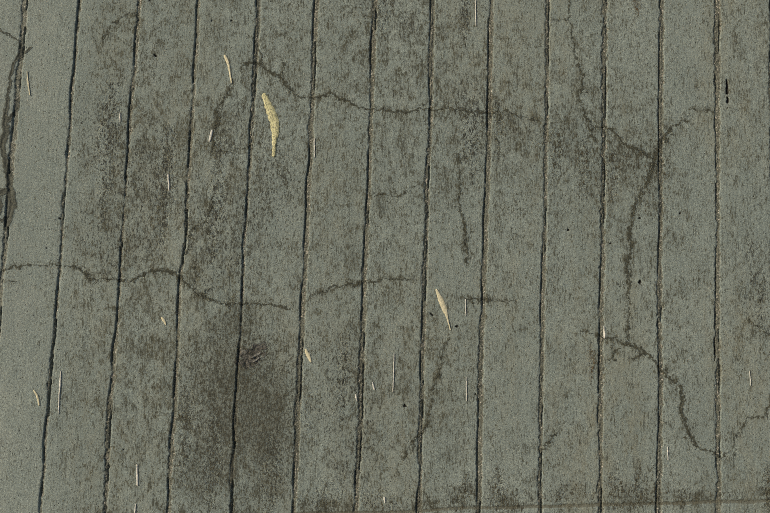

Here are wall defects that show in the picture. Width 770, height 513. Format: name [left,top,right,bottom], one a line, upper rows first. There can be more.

crack [0,29,32,232]
crack [210,47,540,159]
crack [2,194,290,310]
crack [309,276,411,297]
crack [370,181,424,198]
crack [454,153,473,264]
crack [465,298,517,307]
crack [557,0,770,459]
crack [402,337,450,460]